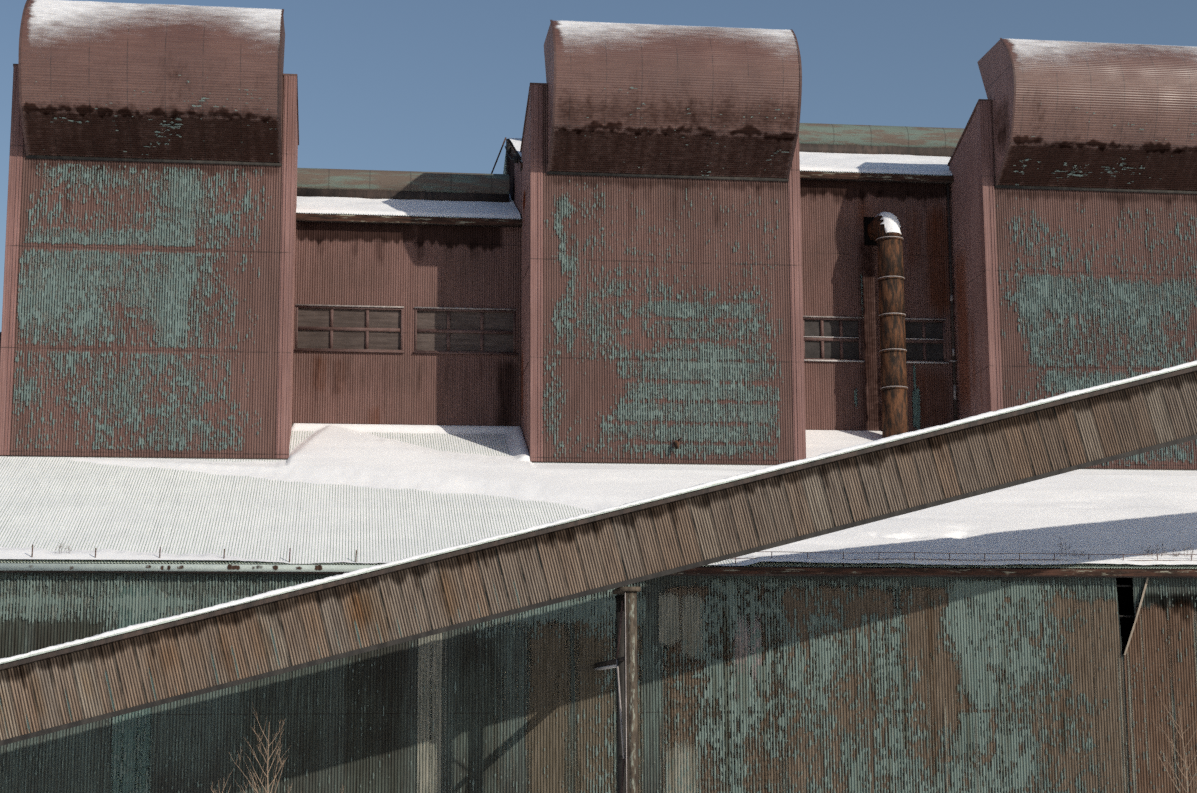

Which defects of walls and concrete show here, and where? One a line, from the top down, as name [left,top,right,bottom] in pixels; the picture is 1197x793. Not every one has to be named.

peeling [1054,158,1151,184]
peeling [13,108,274,452]
peeling [542,165,784,462]
peeling [999,203,1197,406]
peeling [1096,439,1197,466]
peeling [461,578,1197,793]